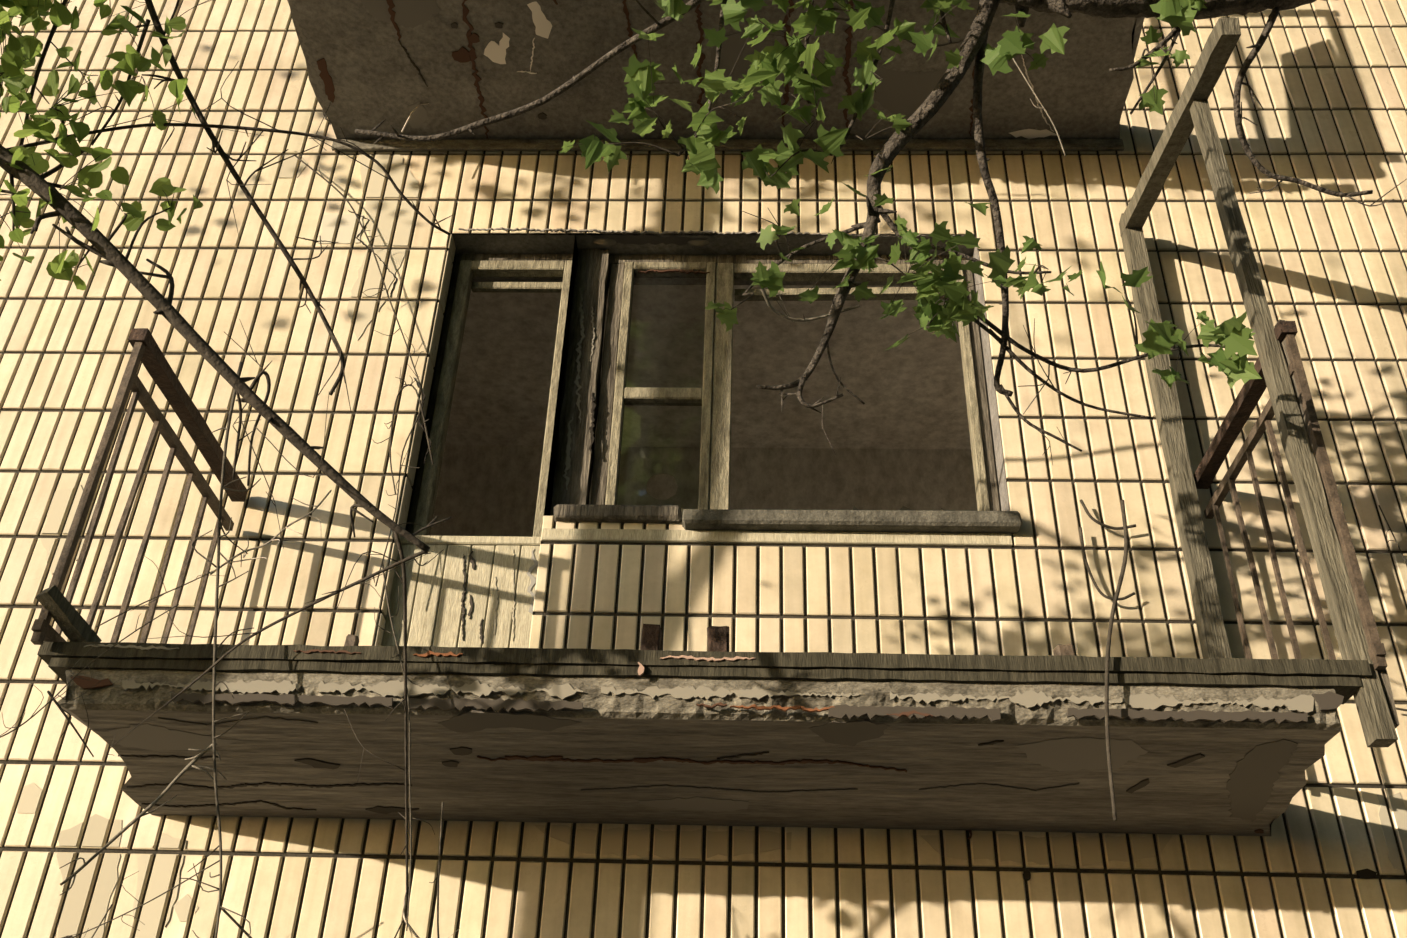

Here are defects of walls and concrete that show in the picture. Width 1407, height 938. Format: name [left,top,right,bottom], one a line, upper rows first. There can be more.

peeling [527,2,552,39]
peeling [484,22,510,64]
peeling [70,676,583,713]
crack [978,739,1004,747]
crack [477,751,1079,793]